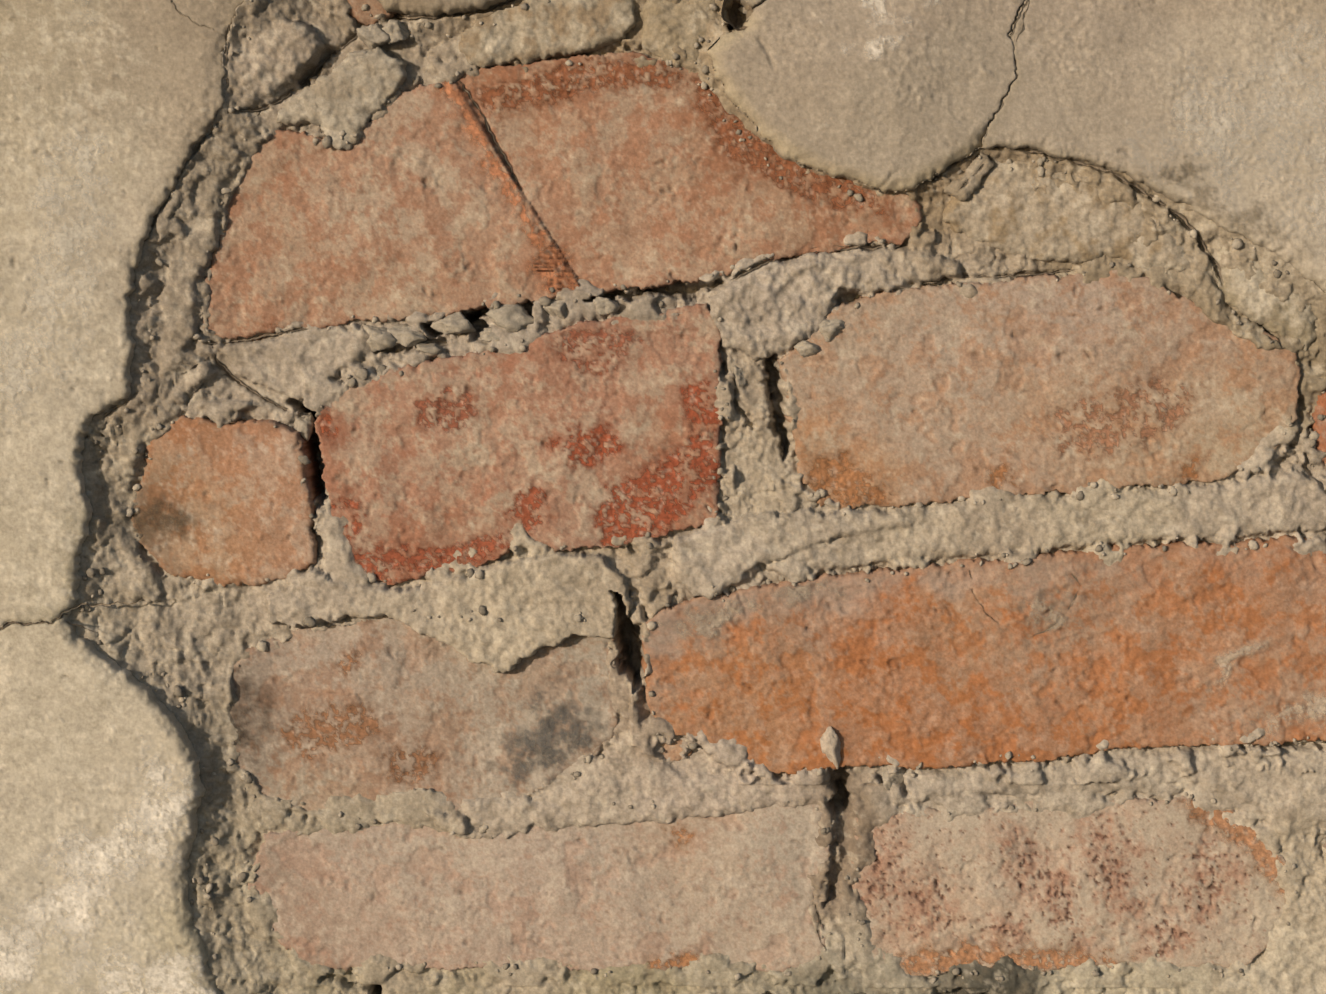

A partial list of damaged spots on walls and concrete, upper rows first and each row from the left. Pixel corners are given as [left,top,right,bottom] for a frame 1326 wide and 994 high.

crack [925,0,1223,284]
crack [912,269,1075,286]
flaking render [692,78,1326,396]
spalling [1055,377,1194,460]
flaking render [68,0,753,994]
spalling [805,451,891,507]
crack [0,597,142,633]
spalling [1182,799,1285,894]
spalling [899,940,1121,974]